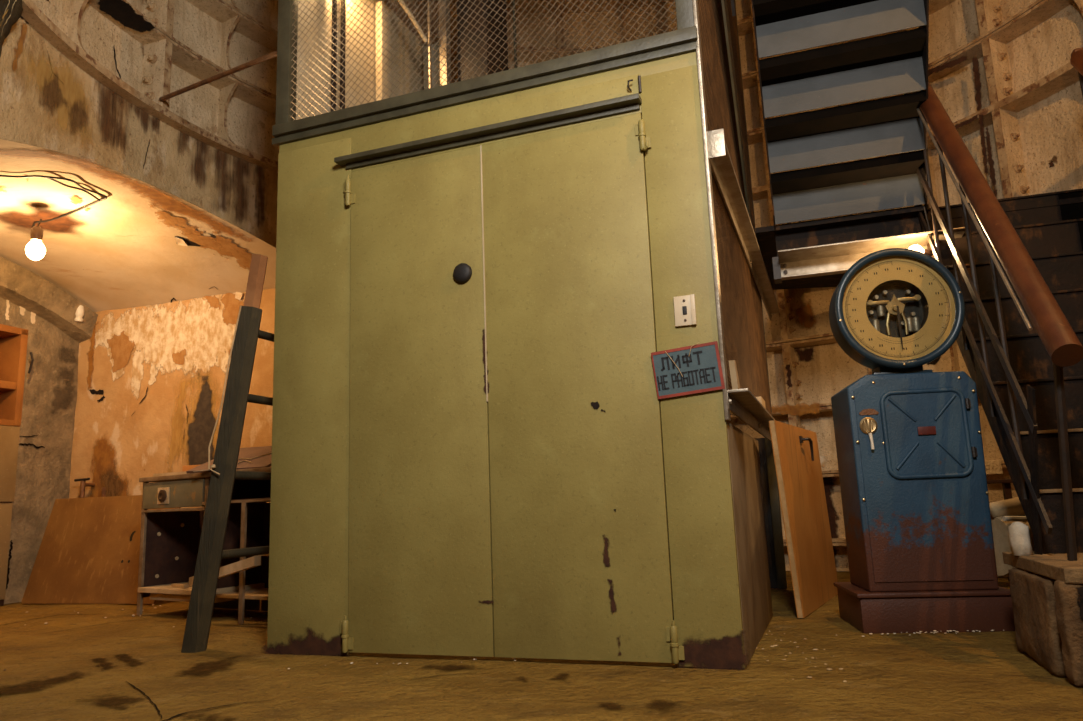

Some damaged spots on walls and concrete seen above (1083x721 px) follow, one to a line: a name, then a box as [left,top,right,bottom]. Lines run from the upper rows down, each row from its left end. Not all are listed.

spalling [97,0,155,33]
damp [12,23,89,138]
damp [99,86,160,147]
damp [0,207,82,233]
peeling [150,205,252,270]
peeling [94,292,244,400]
damp [168,376,218,473]
corrosion [603,535,616,613]
corrosion [262,628,348,657]
corrosion [678,631,748,670]
crack [126,681,269,721]